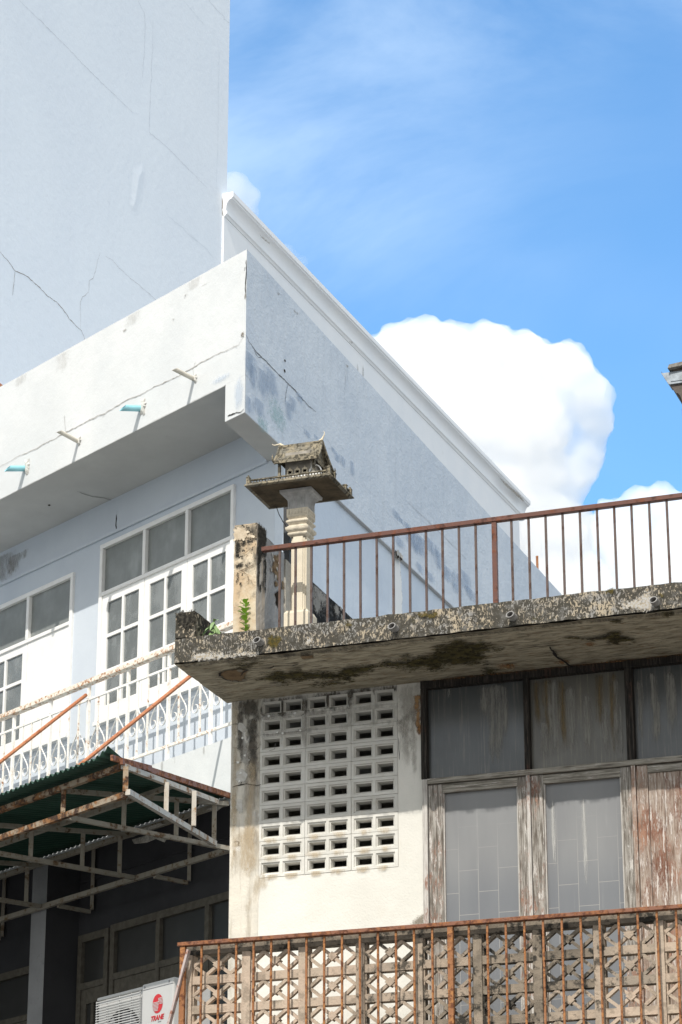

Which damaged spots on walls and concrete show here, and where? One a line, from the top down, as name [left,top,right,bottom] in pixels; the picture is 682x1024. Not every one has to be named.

crack [0,252,142,339]
crack [1,337,316,466]
mould [235,523,267,593]
water stain [185,619,526,667]
crack [528,645,572,667]